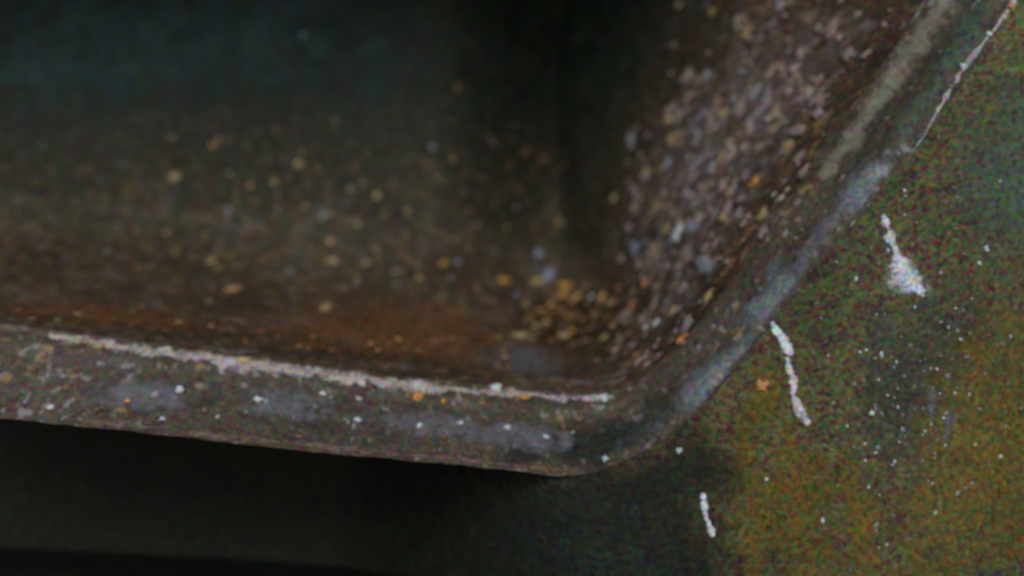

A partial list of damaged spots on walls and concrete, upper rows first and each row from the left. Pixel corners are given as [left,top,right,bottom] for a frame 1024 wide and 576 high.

rust [471,0,871,368]
efflorescence [881,214,926,297]
rust [77,407,157,429]
rust [186,431,280,443]
rust [295,434,569,473]
rust [756,379,769,393]
efflorescence [770,321,810,426]
leakage [485,448,726,576]